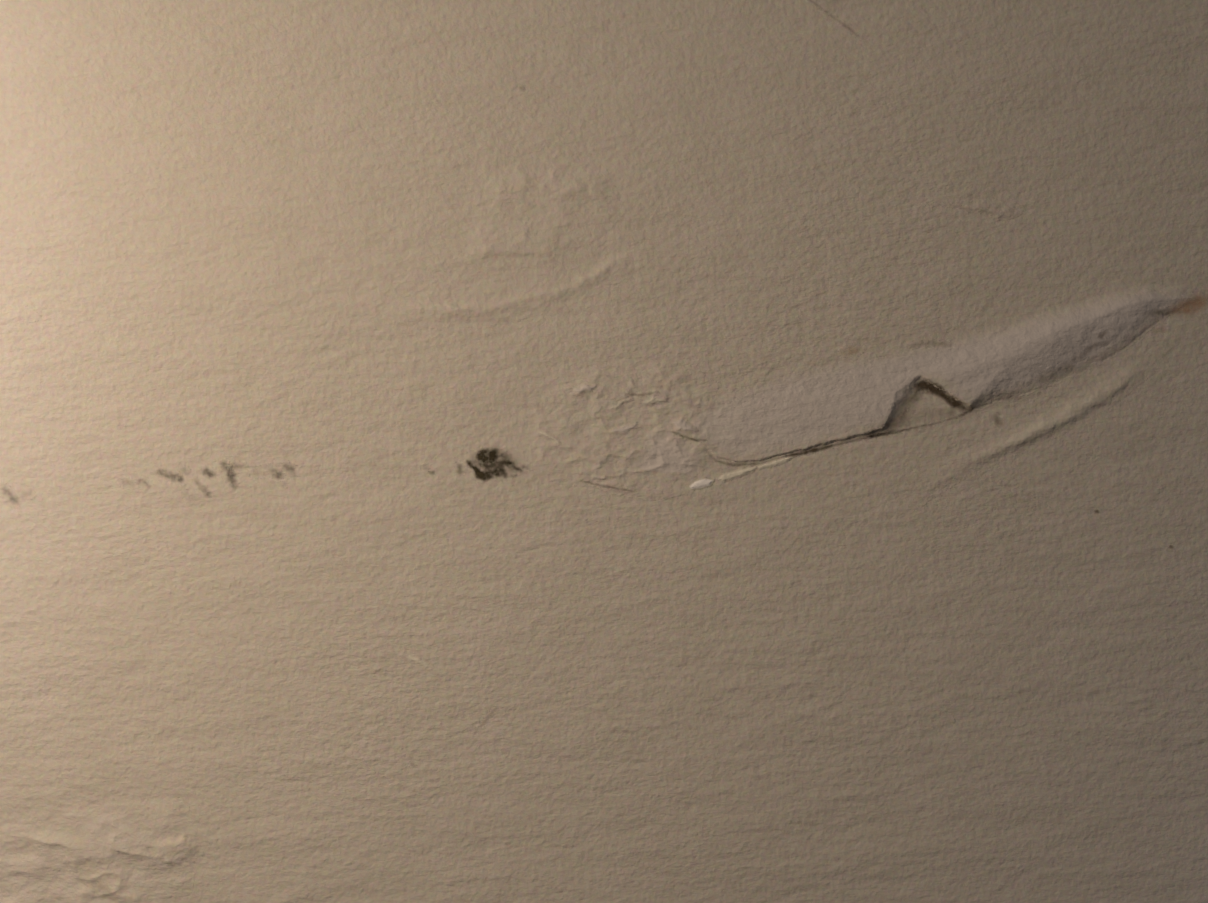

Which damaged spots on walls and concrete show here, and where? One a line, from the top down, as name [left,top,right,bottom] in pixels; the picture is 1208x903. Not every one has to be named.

crack [916,381,973,412]
crack [688,445,832,490]